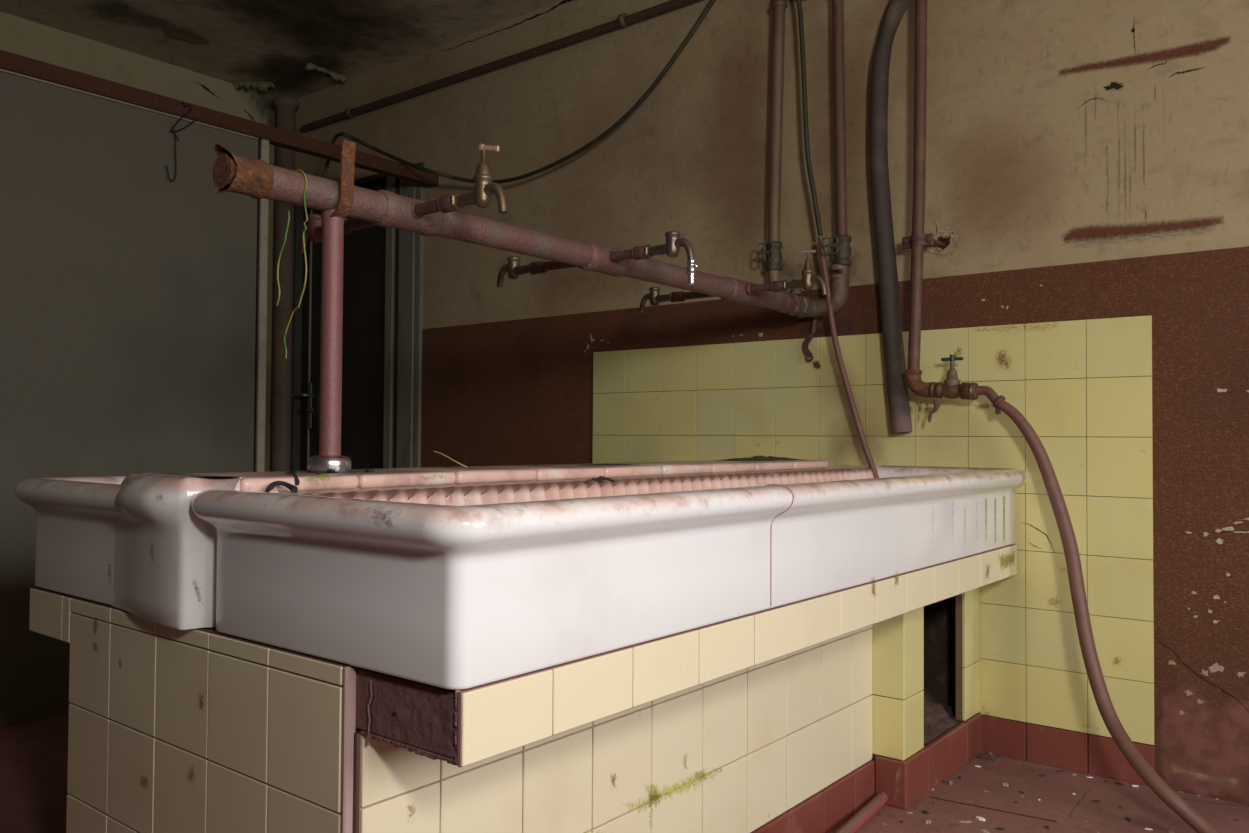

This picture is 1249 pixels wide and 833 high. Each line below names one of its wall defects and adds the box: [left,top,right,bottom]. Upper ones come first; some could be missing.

water stain [223,0,391,89]
peeling [1186,517,1249,544]
crack [1161,642,1249,712]
flaking render [1157,663,1249,803]